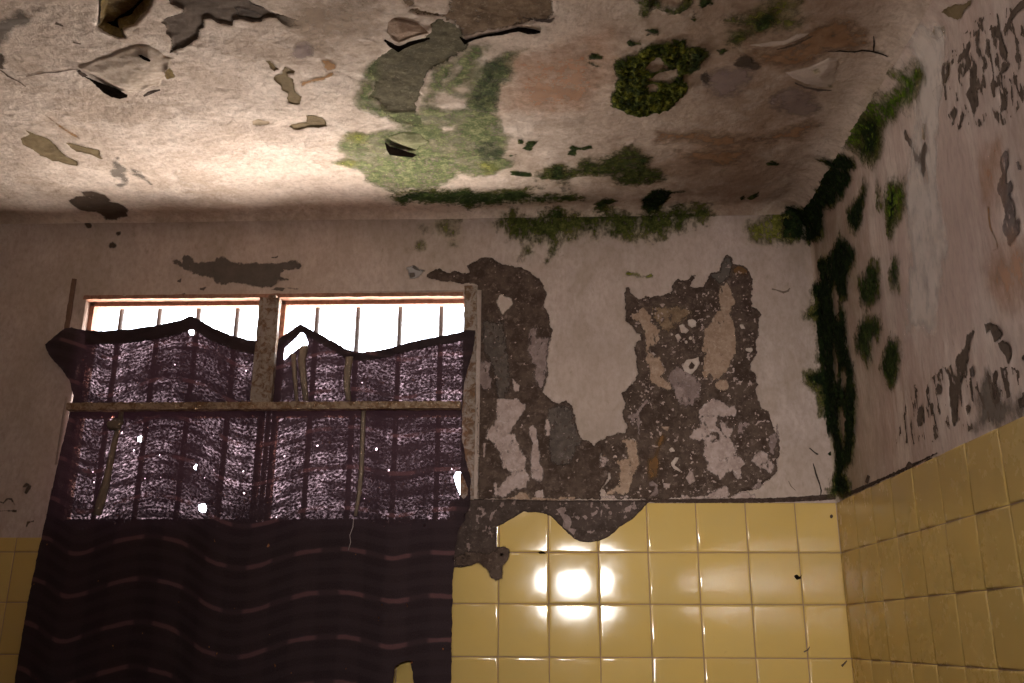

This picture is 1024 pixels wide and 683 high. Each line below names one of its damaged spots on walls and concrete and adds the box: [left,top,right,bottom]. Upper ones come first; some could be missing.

flaking render [98,0,150,37]
peeling [161,0,301,53]
peeling [266,61,302,105]
flaking render [368,0,554,158]
leakage [468,58,512,110]
peeling [931,0,1024,129]
peeling [21,130,103,166]
peeling [289,115,327,130]
peeling [904,125,927,177]
peeling [997,151,1021,247]
flaking render [427,255,780,535]
peeling [896,323,1024,445]